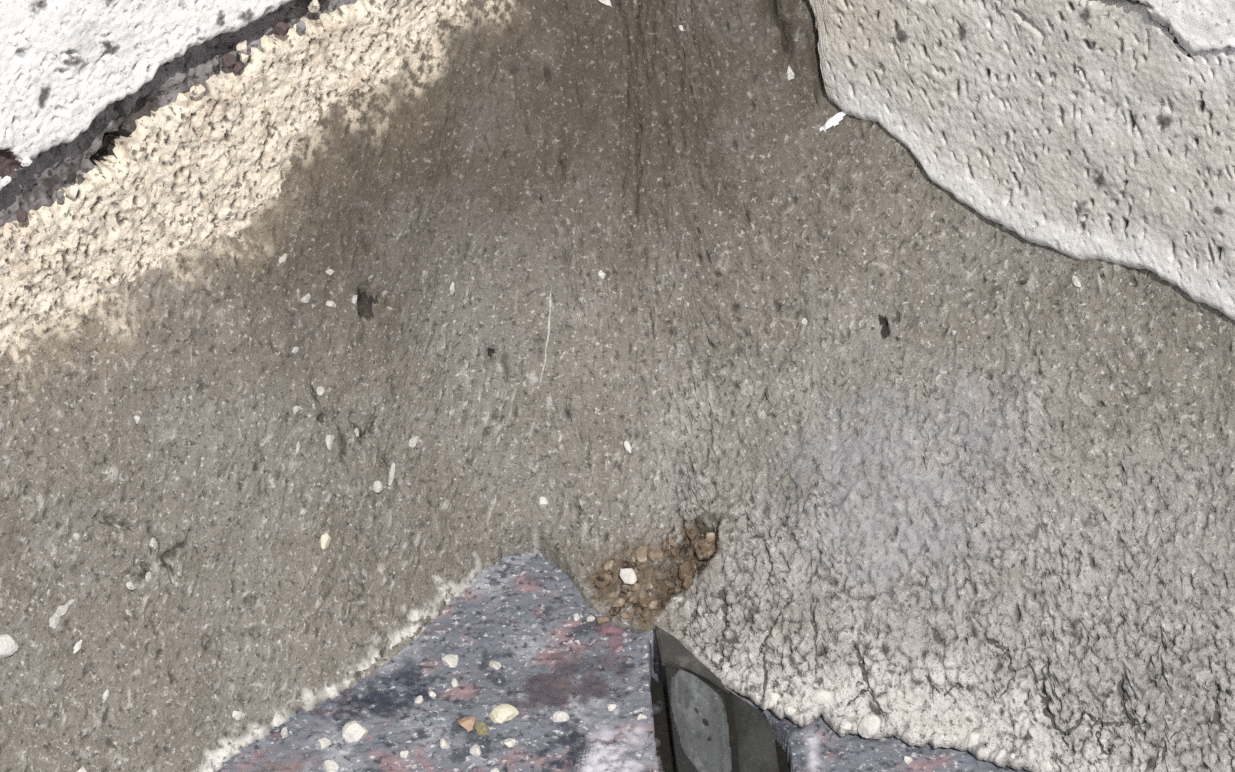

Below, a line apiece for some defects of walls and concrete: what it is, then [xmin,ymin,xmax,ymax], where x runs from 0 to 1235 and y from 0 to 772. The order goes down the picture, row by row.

crack [1127,0,1193,58]
crack [0,0,357,235]
spalling [590,508,723,630]
damp [303,559,480,718]
damp [198,713,287,772]